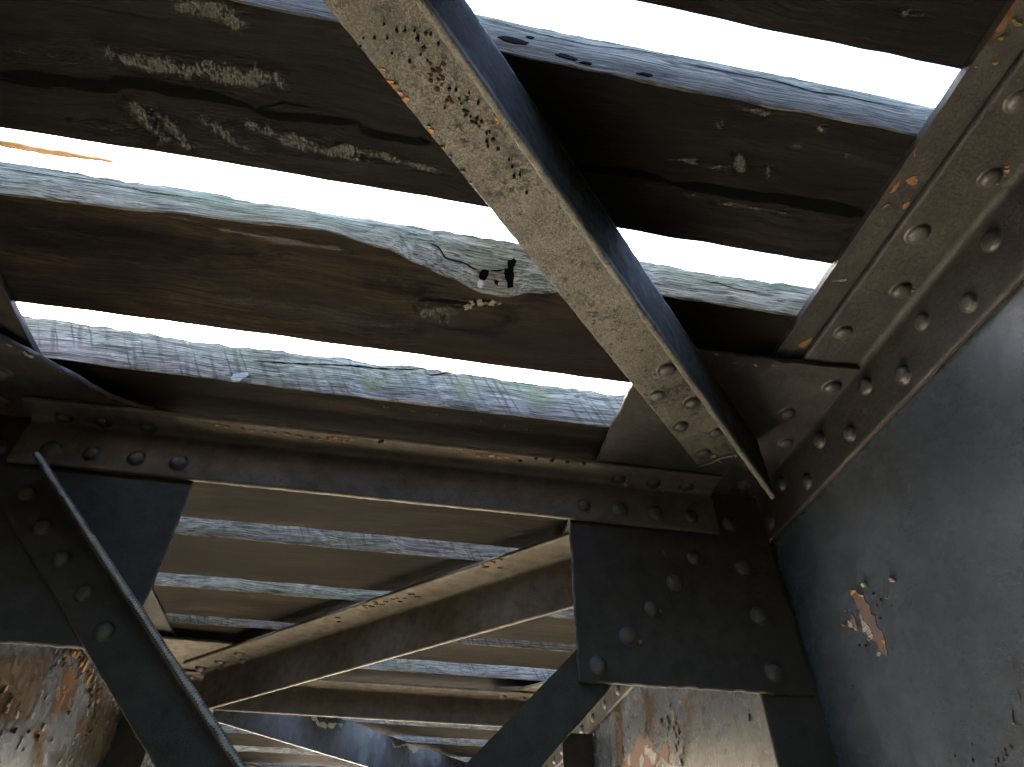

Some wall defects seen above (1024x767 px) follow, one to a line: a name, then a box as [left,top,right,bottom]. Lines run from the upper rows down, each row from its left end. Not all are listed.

peeling [842,583,888,656]
corrosion [0,652,49,728]
corrosion [53,667,79,716]
corrosion [613,703,623,767]